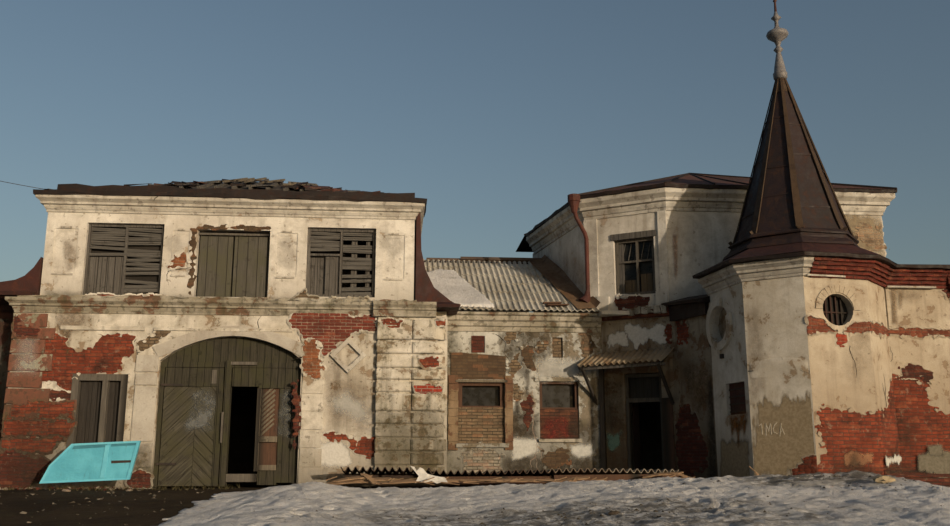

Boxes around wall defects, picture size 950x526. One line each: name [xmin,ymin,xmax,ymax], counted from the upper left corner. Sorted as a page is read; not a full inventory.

peeling [845,215,890,253]
peeling [166,224,271,295]
spalling [293,288,370,299]
peeling [577,333,598,367]
spalling [804,313,950,349]
spalling [0,314,173,489]
spalling [287,313,405,449]
spalling [502,332,550,433]
flaking render [675,361,950,477]
spalling [321,429,376,462]
spalling [458,441,507,473]
spalling [540,446,573,470]